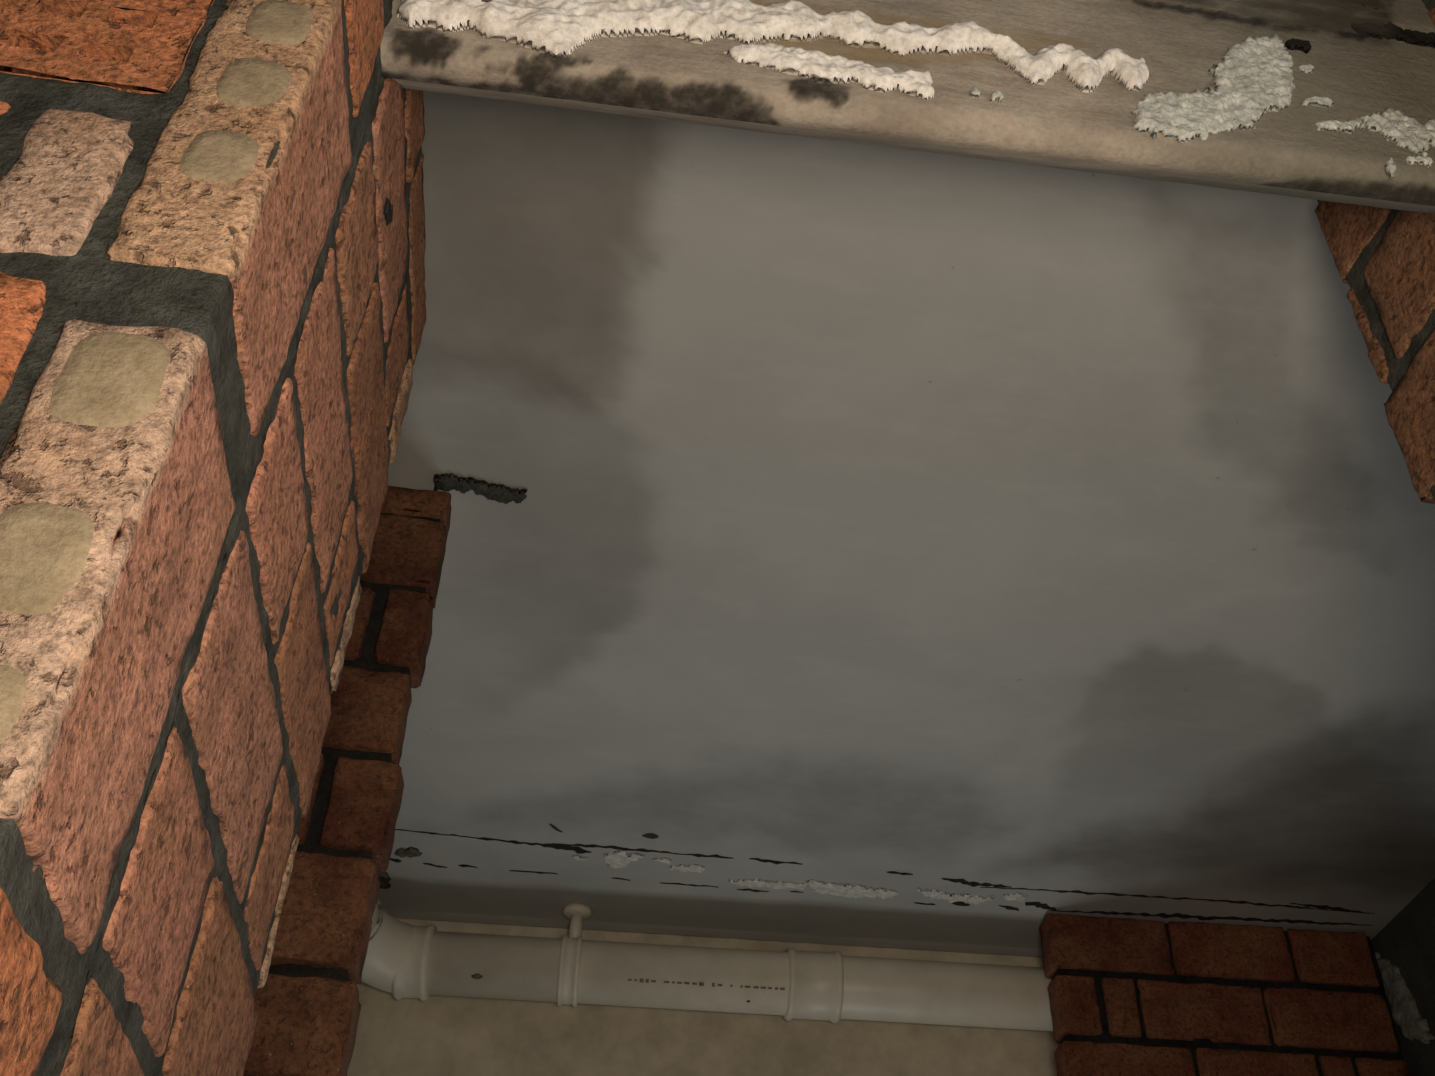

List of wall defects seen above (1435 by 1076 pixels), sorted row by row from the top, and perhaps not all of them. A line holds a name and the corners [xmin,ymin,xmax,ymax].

water stain [381,29,779,126]
water stain [790,74,848,106]
peeling [394,847,422,858]
peeling [573,850,705,874]
peeling [728,878,899,899]
peeling [916,888,1028,905]